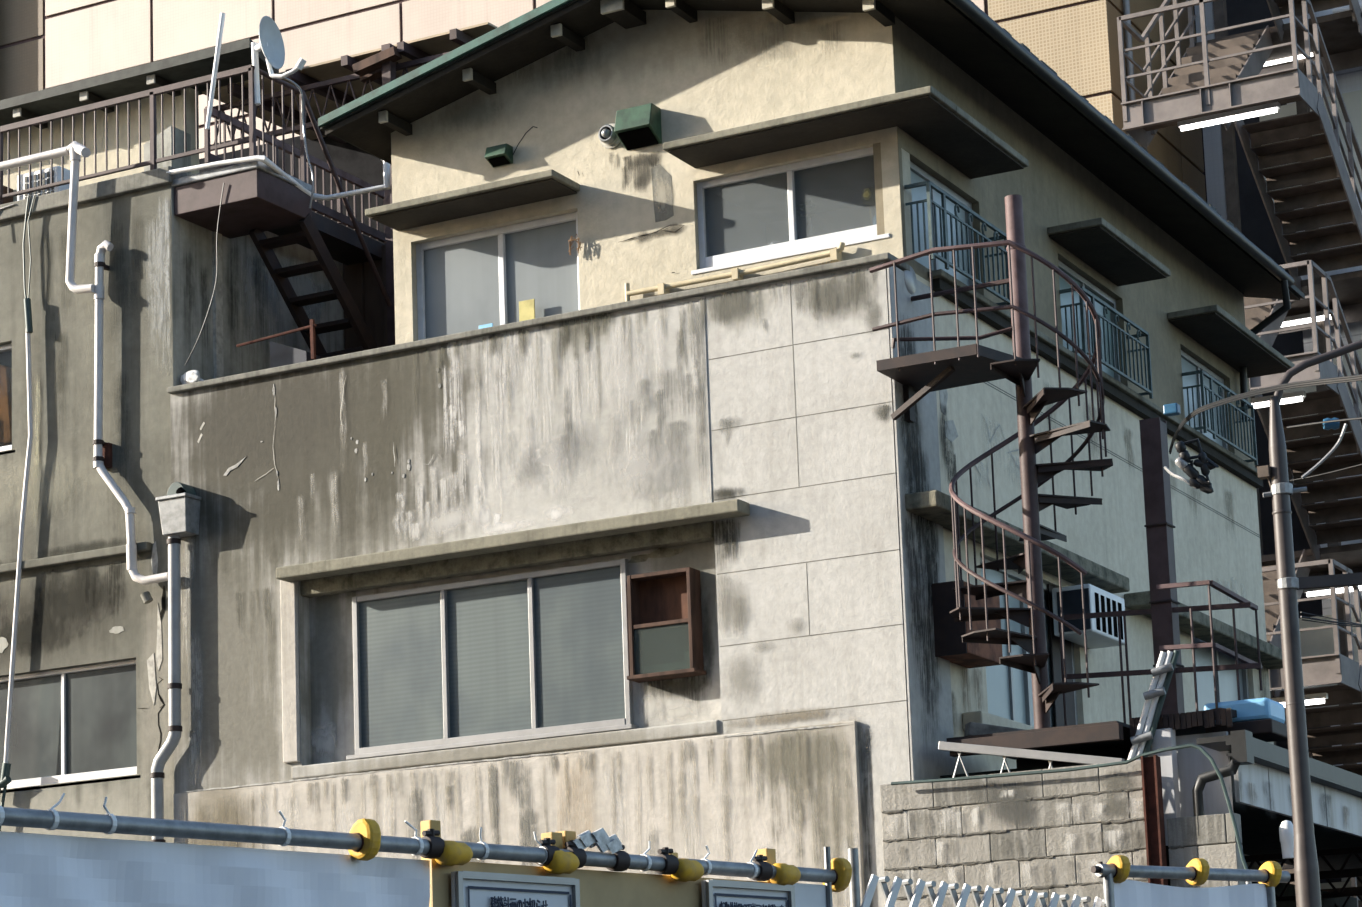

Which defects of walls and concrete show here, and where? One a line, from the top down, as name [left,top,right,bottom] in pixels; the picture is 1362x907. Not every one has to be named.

leakage [611,153,670,211]
leakage [638,225,681,241]
leakage [426,341,480,456]
leakage [478,309,645,460]
leakage [628,290,746,454]
leakage [714,489,741,499]
leakage [1,541,122,653]
leakage [464,760,536,866]
leakage [745,709,841,860]